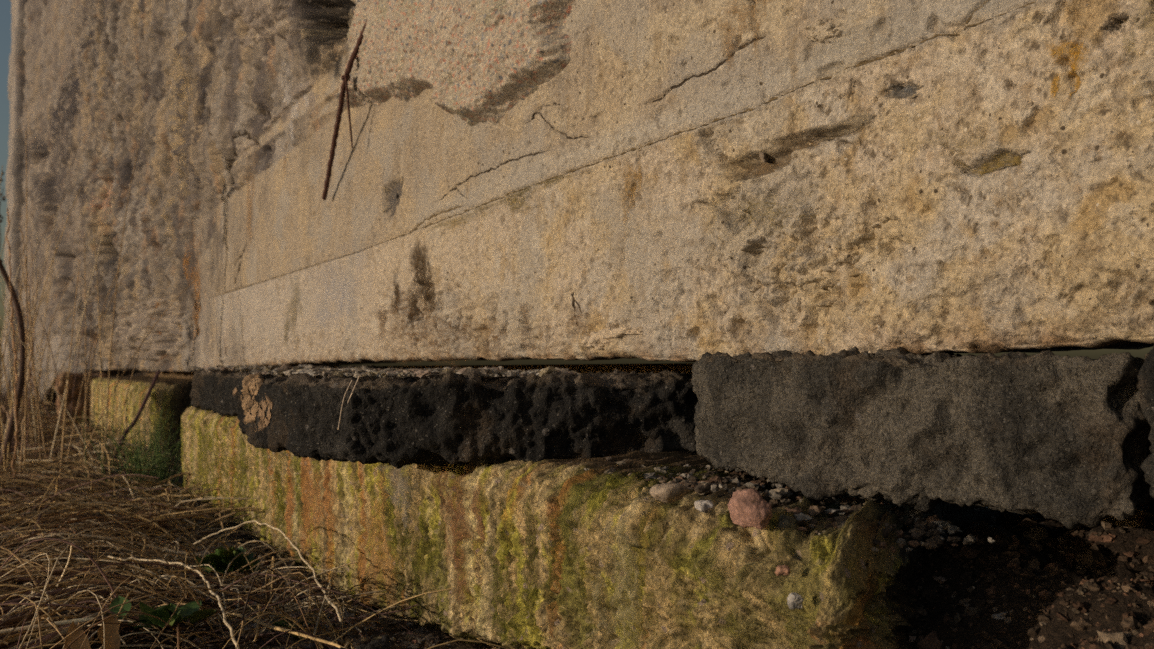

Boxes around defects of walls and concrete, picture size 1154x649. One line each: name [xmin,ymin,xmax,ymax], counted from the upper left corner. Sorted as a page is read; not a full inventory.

spalling [299,0,576,200]
crack [213,0,1035,297]
damp [394,247,435,323]